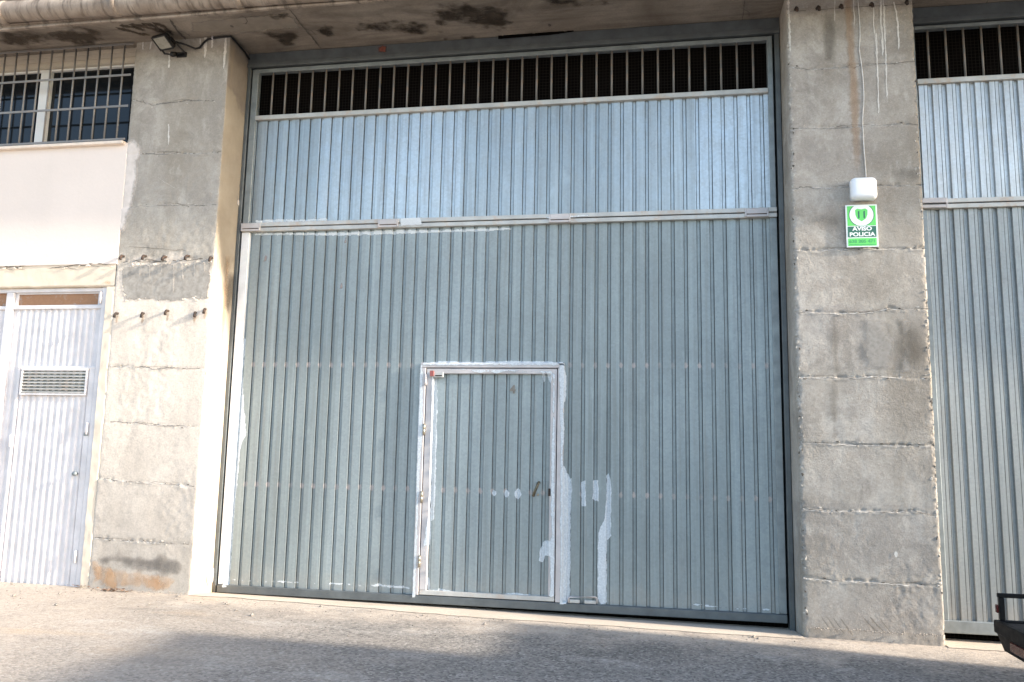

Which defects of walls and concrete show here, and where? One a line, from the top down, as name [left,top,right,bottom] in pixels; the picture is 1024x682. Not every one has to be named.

water stain [193,15,298,69]
water stain [366,4,511,34]